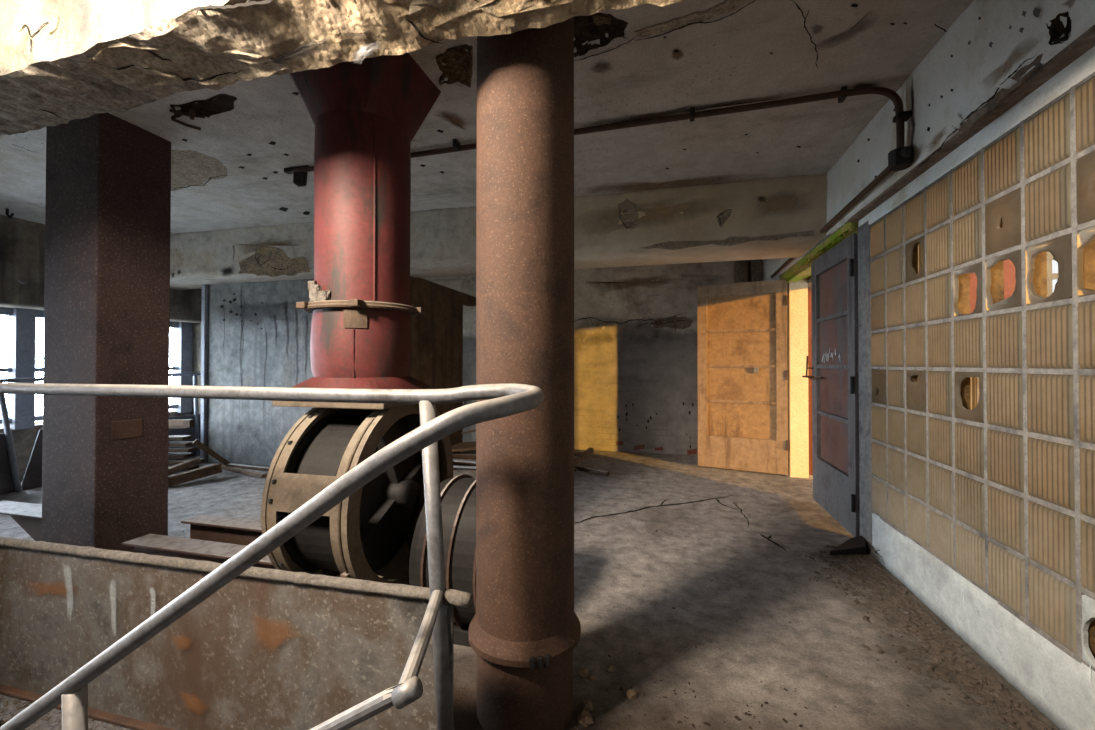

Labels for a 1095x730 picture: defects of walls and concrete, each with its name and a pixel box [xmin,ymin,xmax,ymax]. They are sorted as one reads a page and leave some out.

crack [186,0,273,15]
spalling [574,0,755,61]
crack [791,0,818,69]
spalling [950,8,1071,132]
spalling [88,42,291,191]
spalling [239,247,310,277]
damp [223,294,308,387]
crack [575,494,786,551]